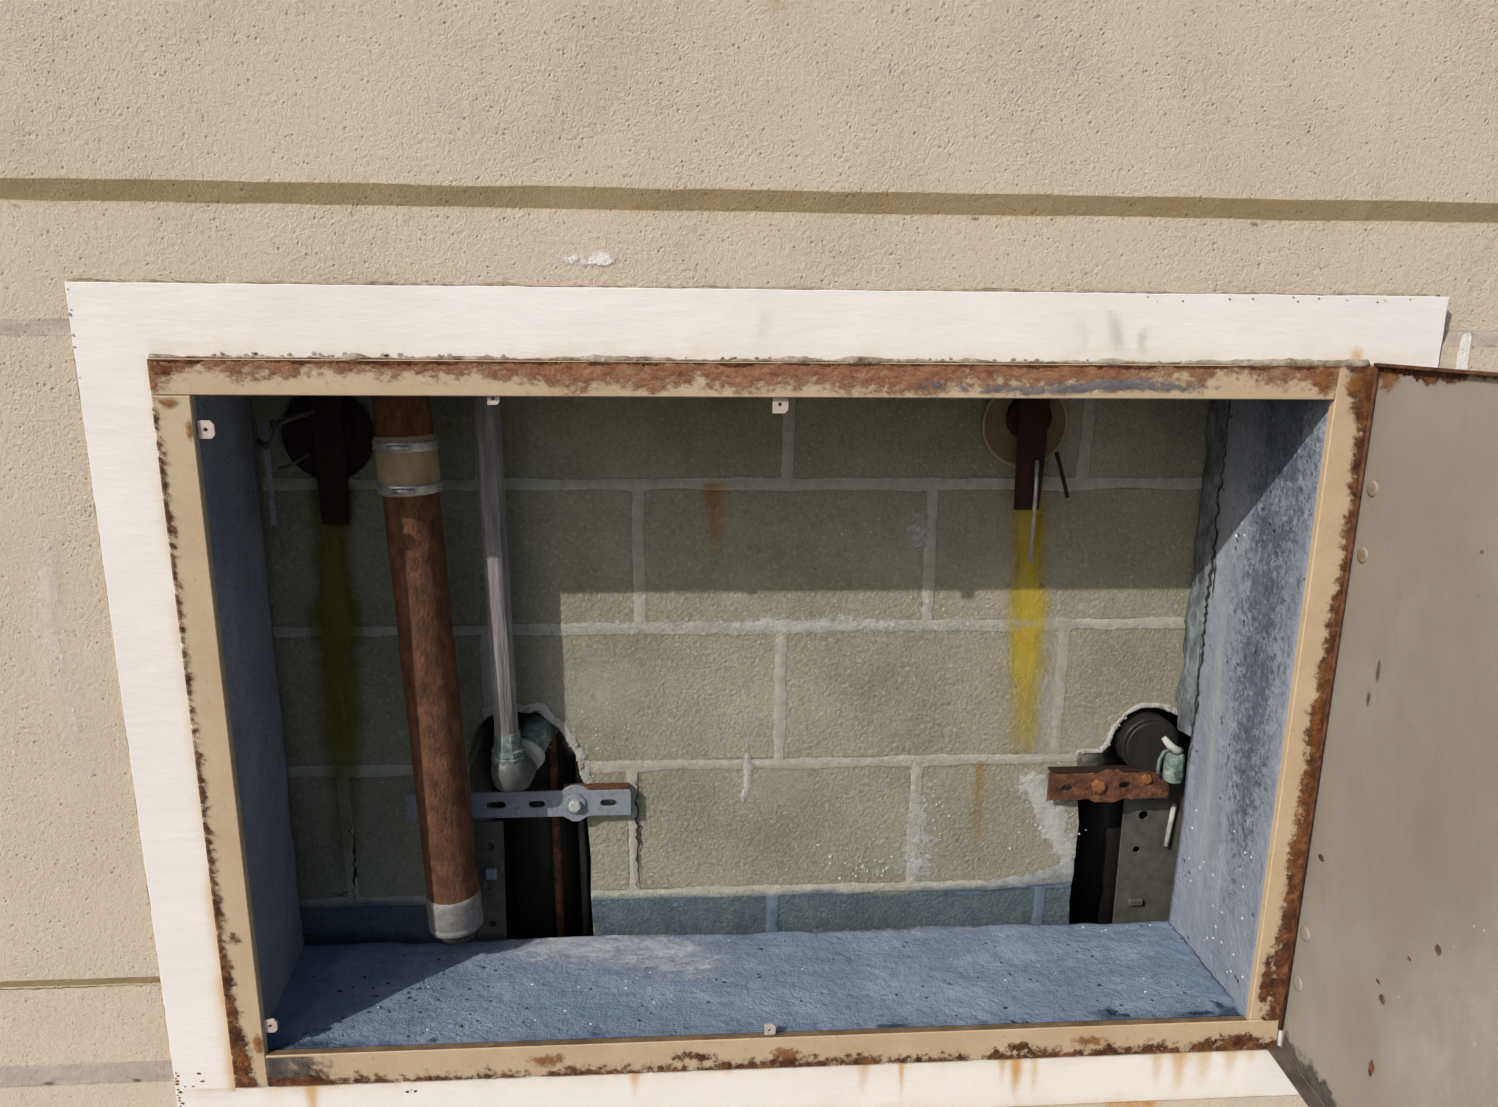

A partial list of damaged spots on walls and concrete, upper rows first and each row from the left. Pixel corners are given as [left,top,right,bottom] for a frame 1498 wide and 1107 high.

water stain [598,488,1054,704]
spalling [517,702,593,784]
corrosion [147,359,1498,1088]
spalling [1075,703,1178,756]